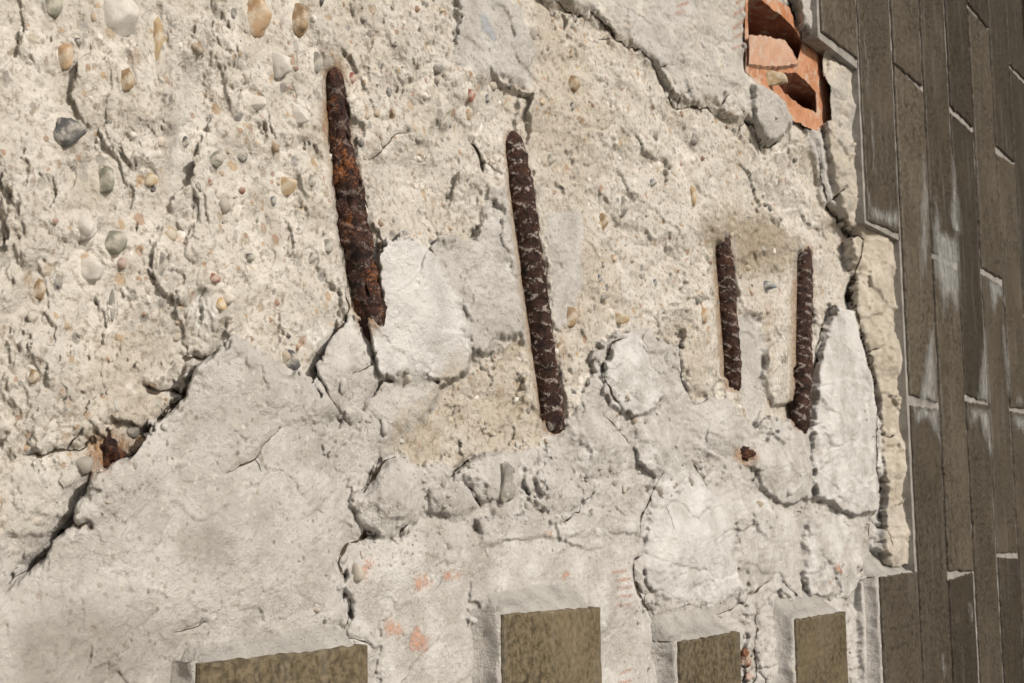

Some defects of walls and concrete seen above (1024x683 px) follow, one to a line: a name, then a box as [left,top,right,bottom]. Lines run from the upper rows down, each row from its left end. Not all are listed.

crack [555,0,779,153]
crack [809,132,894,544]
crack [143,352,214,431]
crack [23,431,97,458]
corrosion [87,435,126,467]
crack [9,522,88,584]
crack [716,581,803,683]